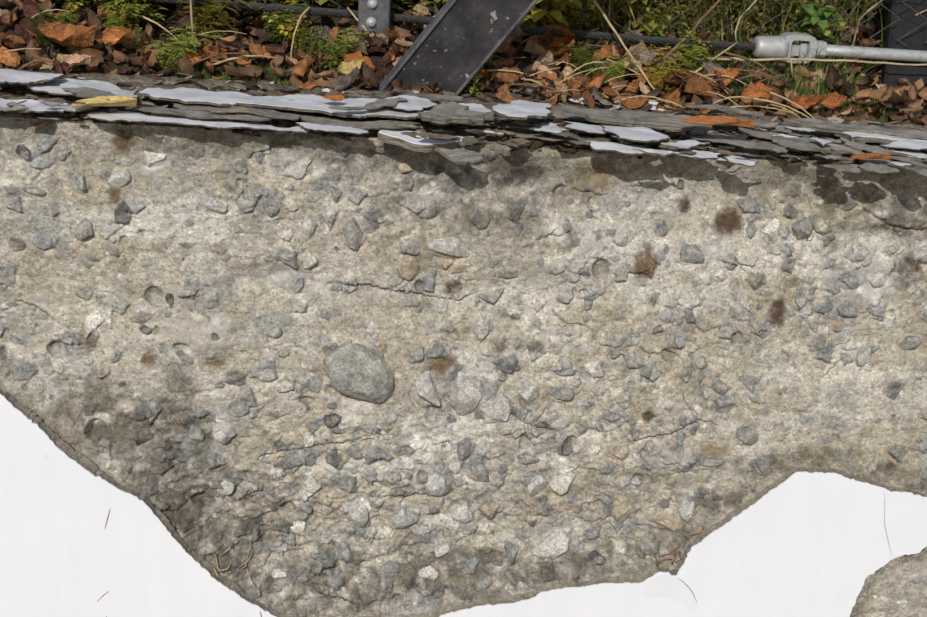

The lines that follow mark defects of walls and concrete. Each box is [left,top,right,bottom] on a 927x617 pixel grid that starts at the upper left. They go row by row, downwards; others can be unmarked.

peeling [0,69,463,135]
spalling [281,157,312,180]
peeling [377,129,479,152]
peeling [436,147,485,165]
peeling [458,100,788,160]
peeling [737,118,927,177]
rust [715,209,741,234]
rust [636,246,656,278]
crack [328,282,469,300]
spalling [323,342,395,404]
spalling [454,371,481,416]
spalling [850,546,927,617]